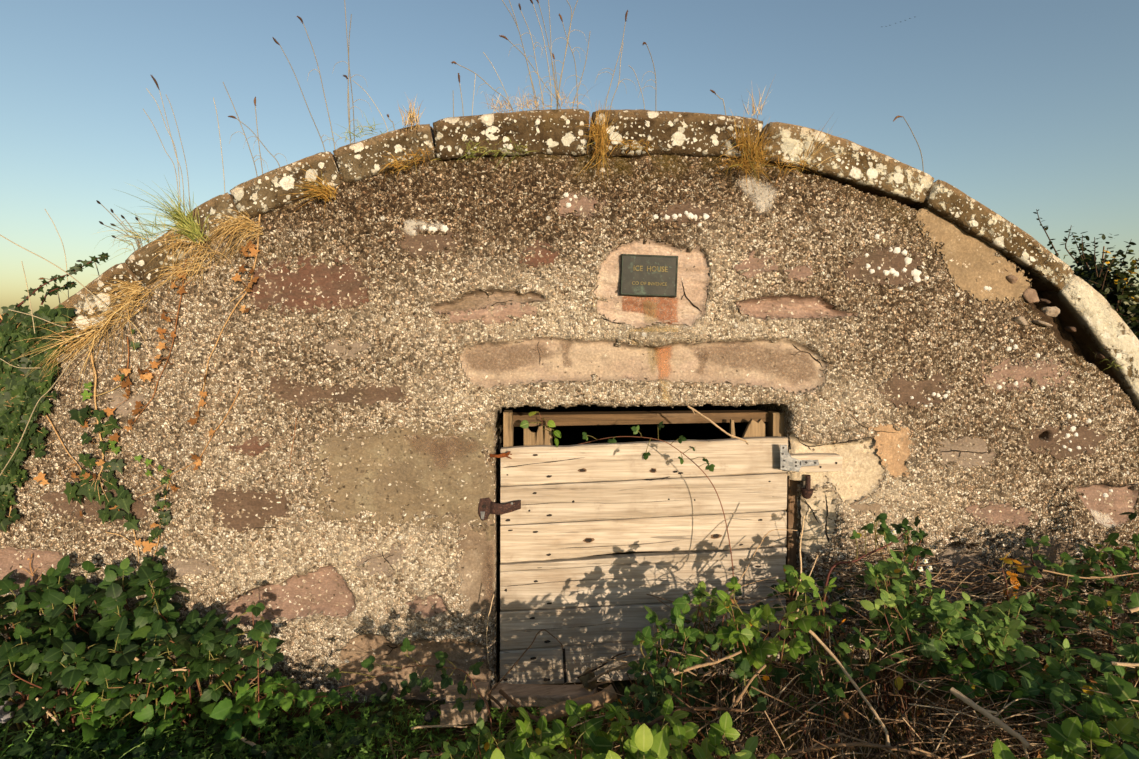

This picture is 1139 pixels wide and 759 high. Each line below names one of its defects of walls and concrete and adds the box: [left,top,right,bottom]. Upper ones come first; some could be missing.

peeling [841,207,1032,305]
spalling [877,365,955,410]
peeling [307,422,496,621]
peeling [787,423,913,554]